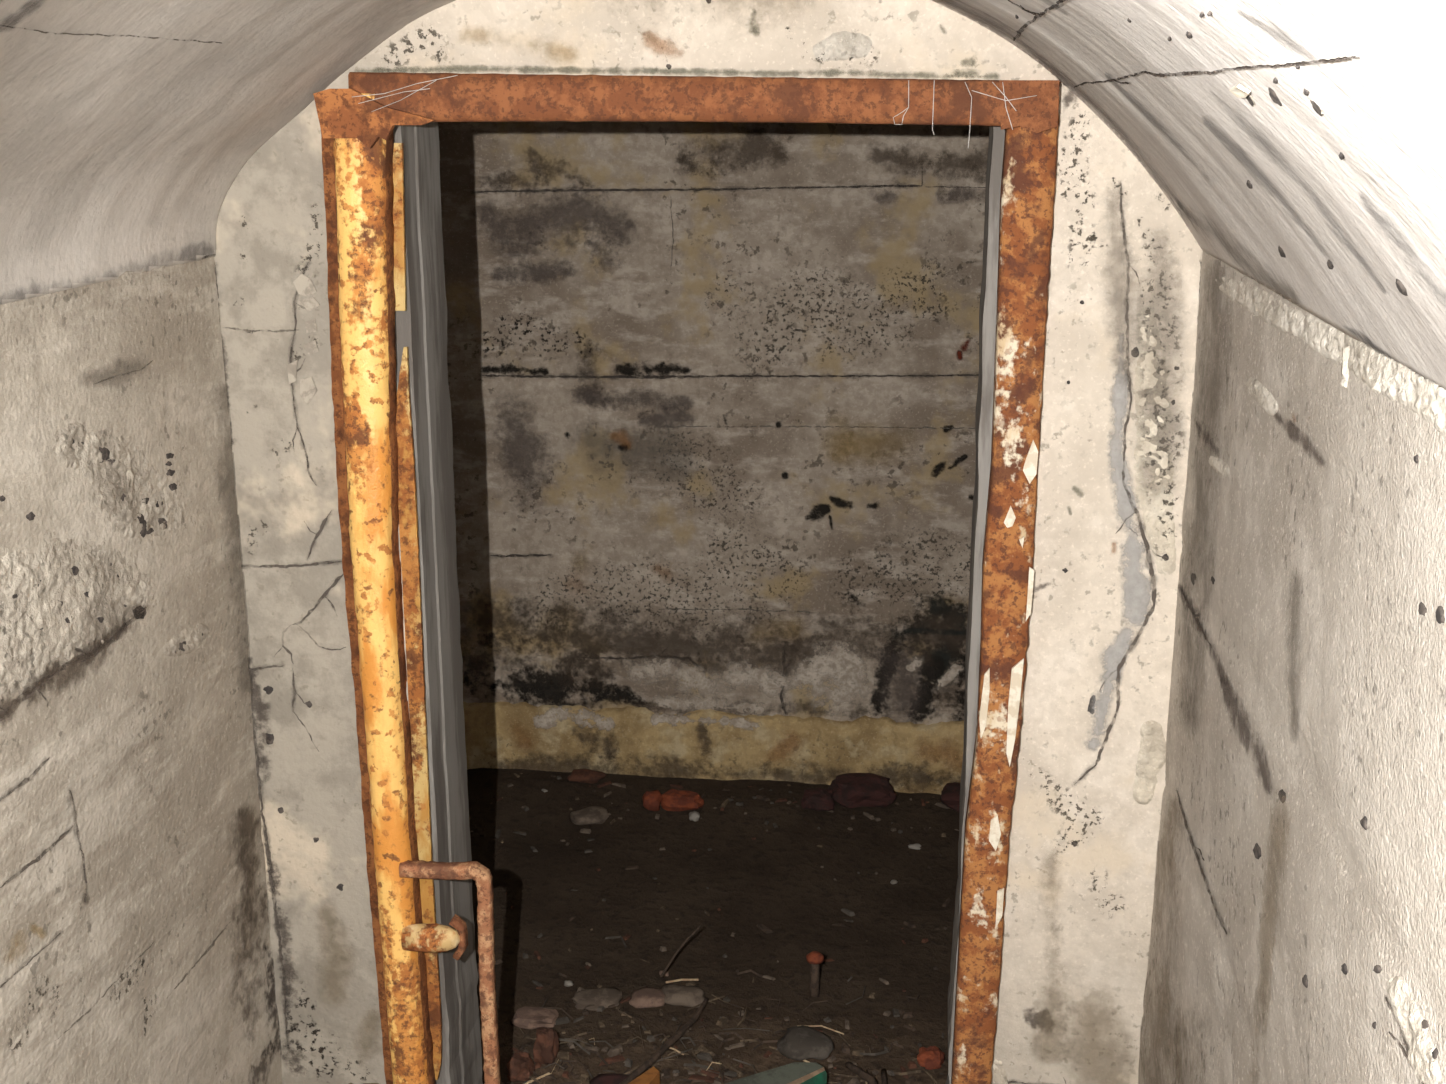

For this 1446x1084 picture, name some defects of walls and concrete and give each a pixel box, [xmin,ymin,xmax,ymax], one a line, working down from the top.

crack [4,25,221,43]
crack [1008,0,1068,41]
crack [1074,56,1356,88]
damp [873,149,987,201]
damp [738,263,958,368]
damp [481,312,756,515]
damp [805,497,878,529]
damp [932,454,968,477]
crack [1079,186,1211,780]
crack [204,254,346,1047]
damp [462,533,971,784]
spalling [1373,965,1444,1084]